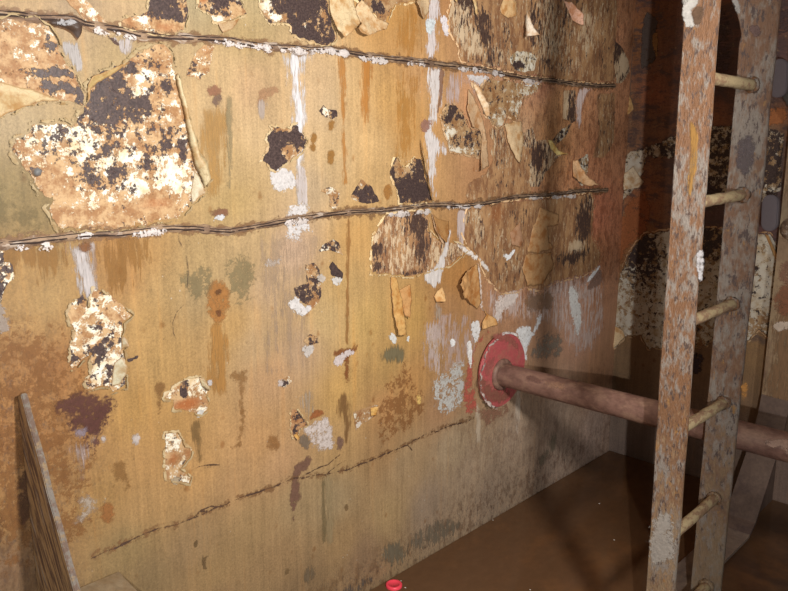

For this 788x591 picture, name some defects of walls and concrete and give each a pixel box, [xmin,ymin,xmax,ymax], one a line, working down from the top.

peeling [258,0,430,47]
peeling [0,0,247,233]
damp [270,149,313,242]
damp [215,39,388,133]
damp [407,0,505,197]
peeling [369,0,630,336]
peeling [65,286,138,395]
corrosion [207,280,230,395]
damp [425,204,603,360]
corrosion [56,392,112,449]
corrosion [17,472,29,524]
crack [91,416,471,559]